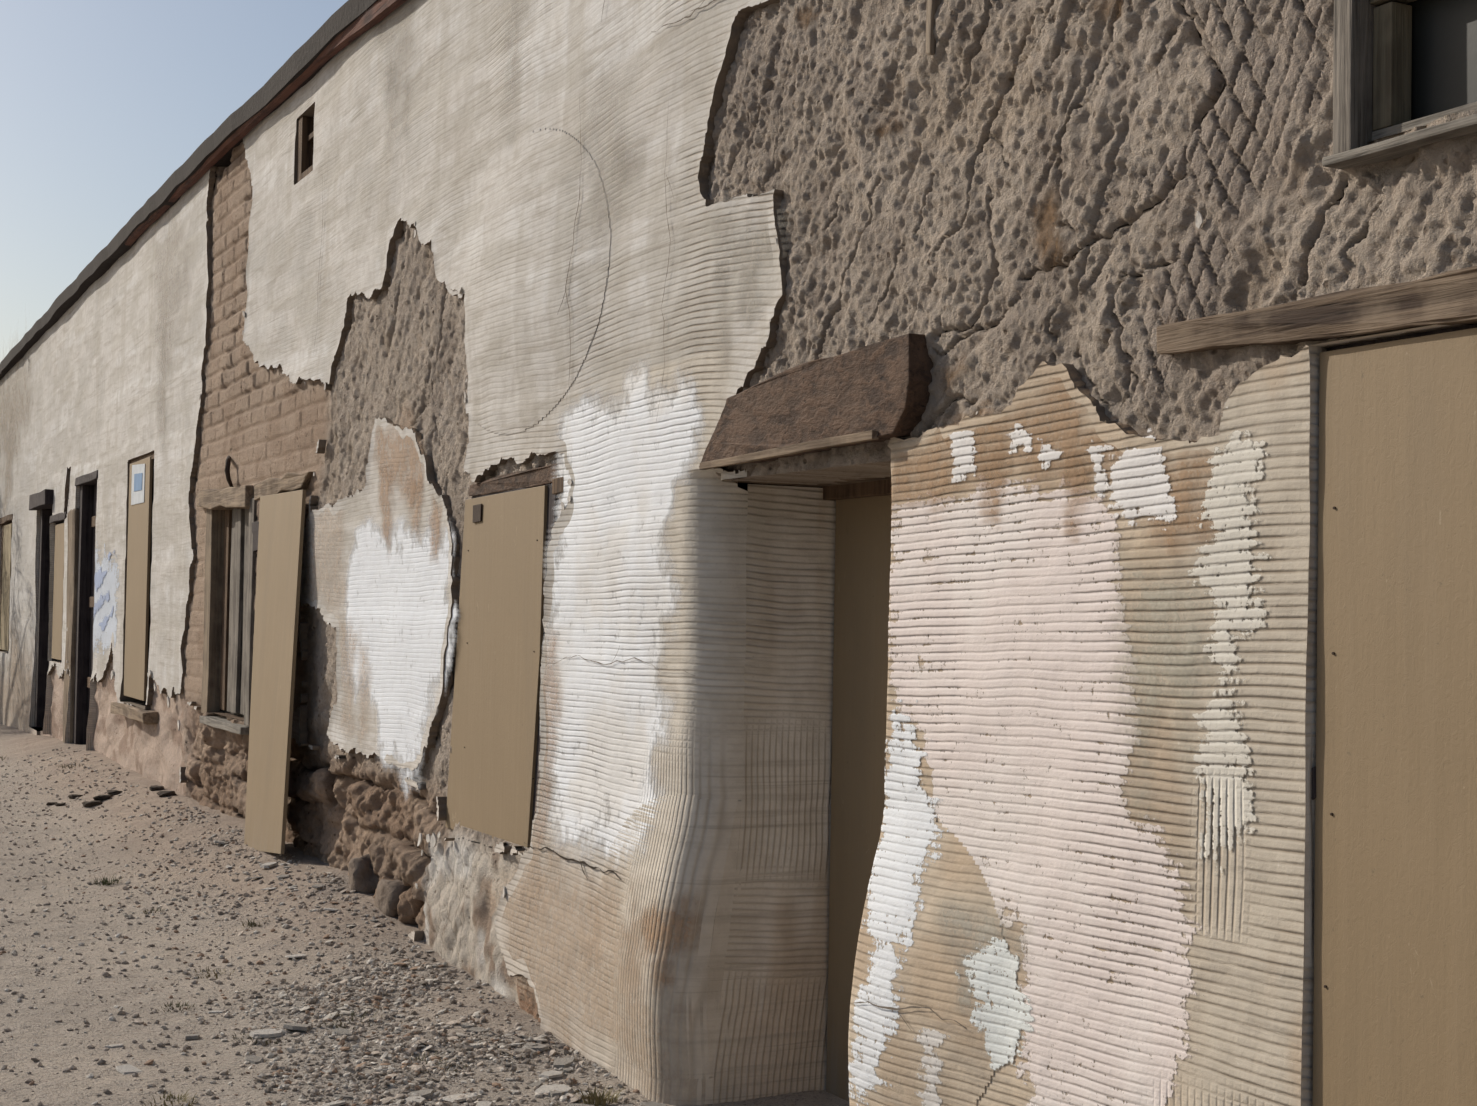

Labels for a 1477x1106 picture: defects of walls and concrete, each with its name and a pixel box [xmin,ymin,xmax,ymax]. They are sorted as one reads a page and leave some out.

crack [651,0,716,32]
crack [1181,5,1225,130]
crack [1026,168,1187,280]
peeling [147,142,703,868]
spalling [708,0,1477,1106]
spalling [415,820,541,1023]
crack [527,844,621,880]
crack [855,1001,967,1031]